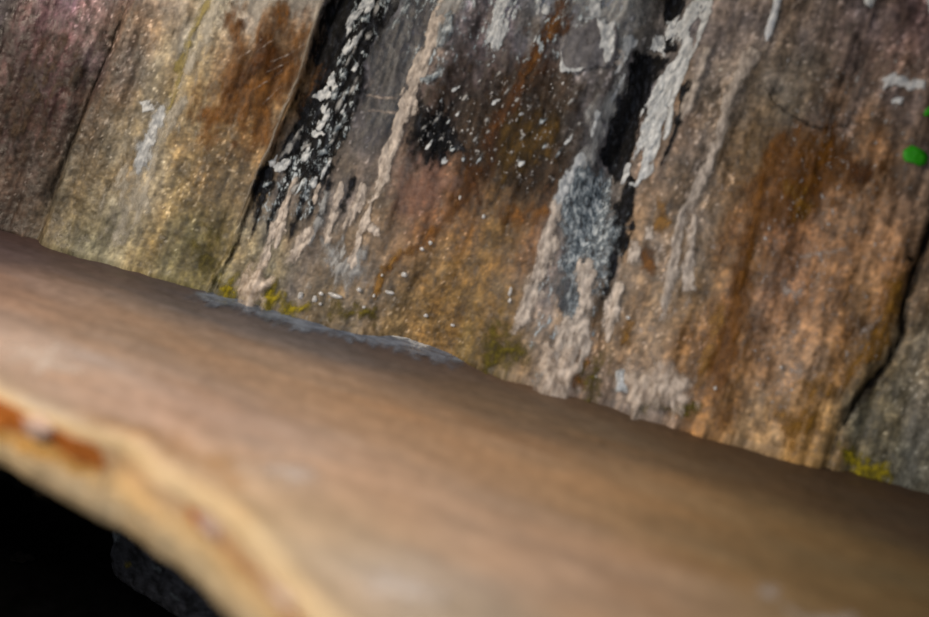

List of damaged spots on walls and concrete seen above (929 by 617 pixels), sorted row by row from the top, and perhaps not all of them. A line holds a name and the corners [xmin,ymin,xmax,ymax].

corrosion [0,400,105,473]
corrosion [188,2,311,150]
water stain [251,155,308,270]
water stain [286,0,465,306]
water stain [487,0,513,51]
water stain [508,0,713,372]
water stain [659,46,761,321]
corrosion [697,125,894,404]
corrosion [774,376,832,449]
crack [843,224,929,424]